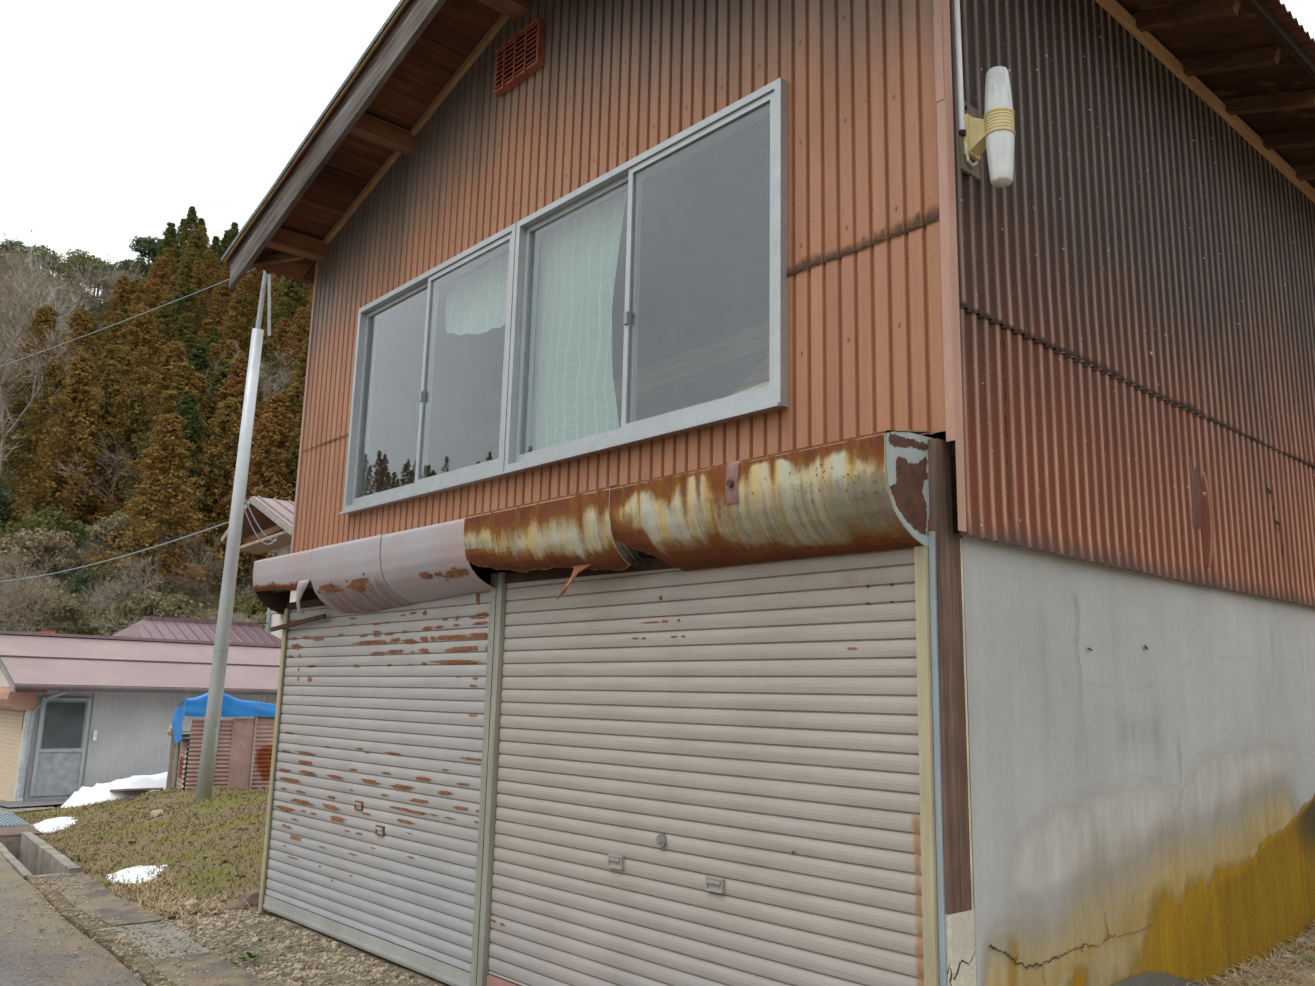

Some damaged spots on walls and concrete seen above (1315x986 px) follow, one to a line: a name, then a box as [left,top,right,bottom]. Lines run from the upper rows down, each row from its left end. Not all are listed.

corrosion [464,430,923,573]
leakage [984,750,1315,986]
crack [947,894,1157,986]